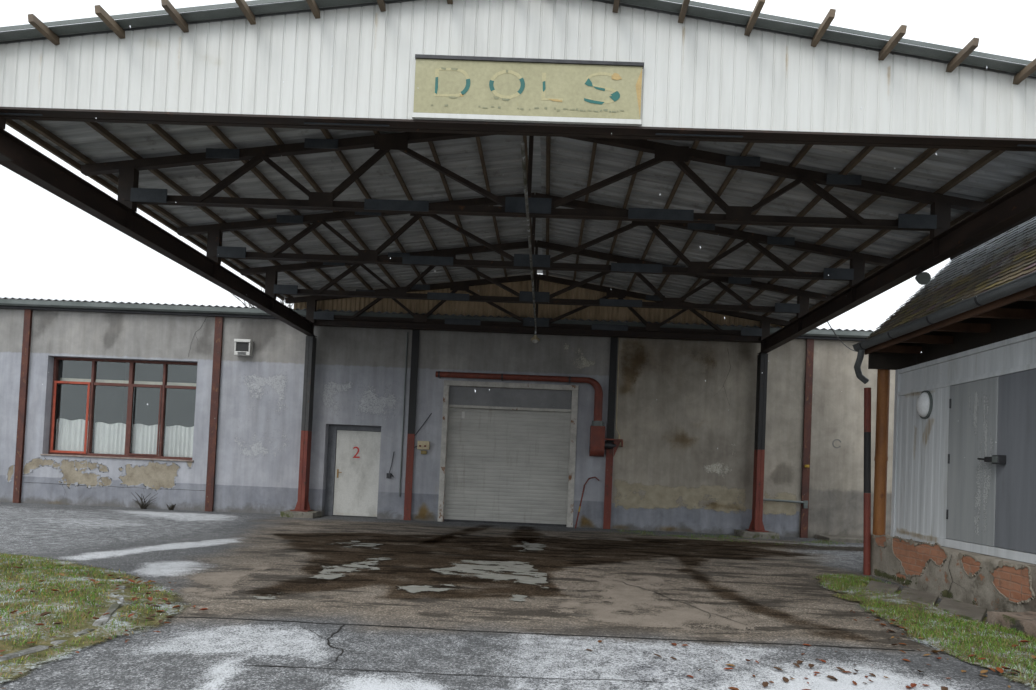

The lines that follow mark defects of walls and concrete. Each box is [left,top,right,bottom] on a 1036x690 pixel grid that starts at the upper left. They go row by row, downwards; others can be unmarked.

peeling [6,456,194,491]
spalling [871,534,1035,605]
crack [172,580,915,679]